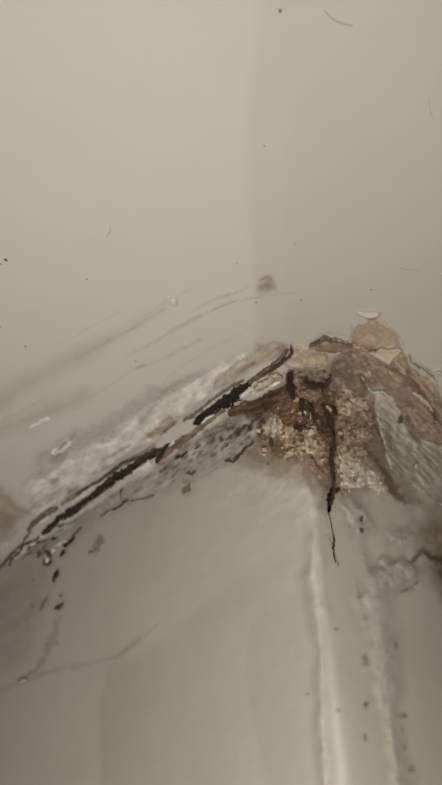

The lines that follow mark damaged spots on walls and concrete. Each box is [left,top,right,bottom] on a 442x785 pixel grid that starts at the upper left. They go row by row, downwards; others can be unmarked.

flaking render [0,311,442,569]
crack [306,403,341,563]